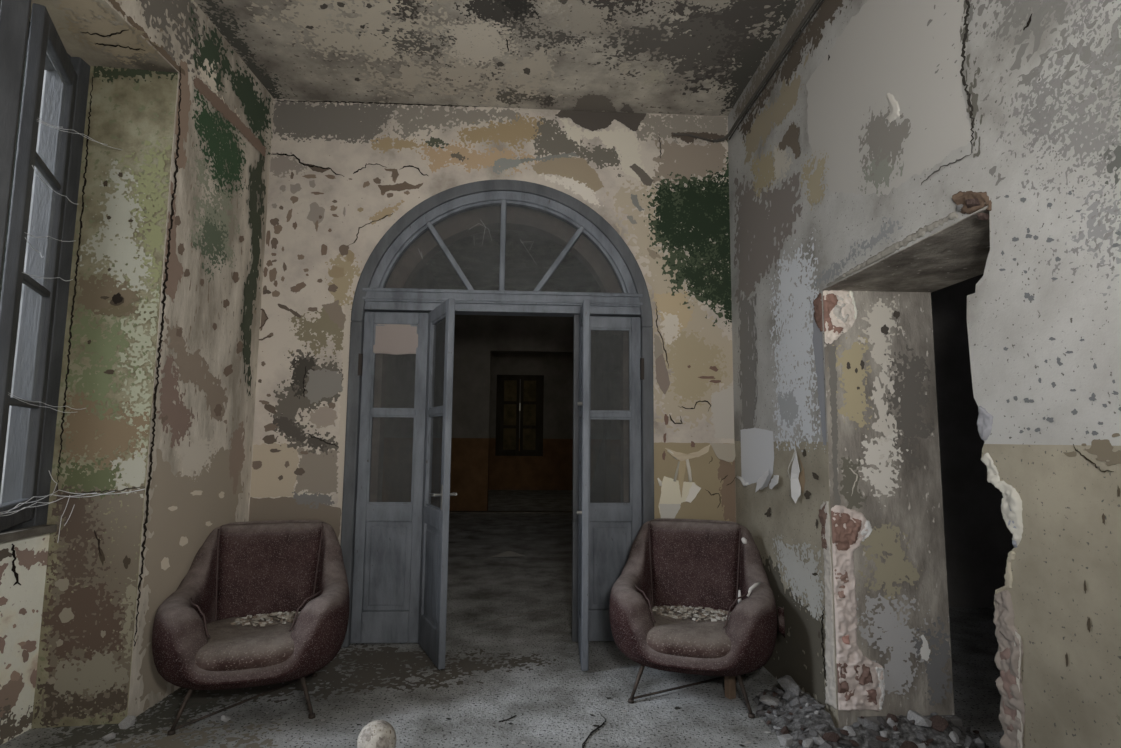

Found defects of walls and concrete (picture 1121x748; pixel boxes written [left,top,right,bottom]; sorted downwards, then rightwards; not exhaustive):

leakage [57,0,177,83]
leakage [80,159,160,498]
peeling [263,164,363,330]
crack [272,153,428,176]
leakage [189,0,953,711]
flaking render [555,94,647,131]
crack [921,0,975,185]
leakage [54,577,136,702]
peeling [0,315,343,727]
leakage [174,433,221,482]
flaking render [798,191,992,711]
flaking render [977,406,1025,748]